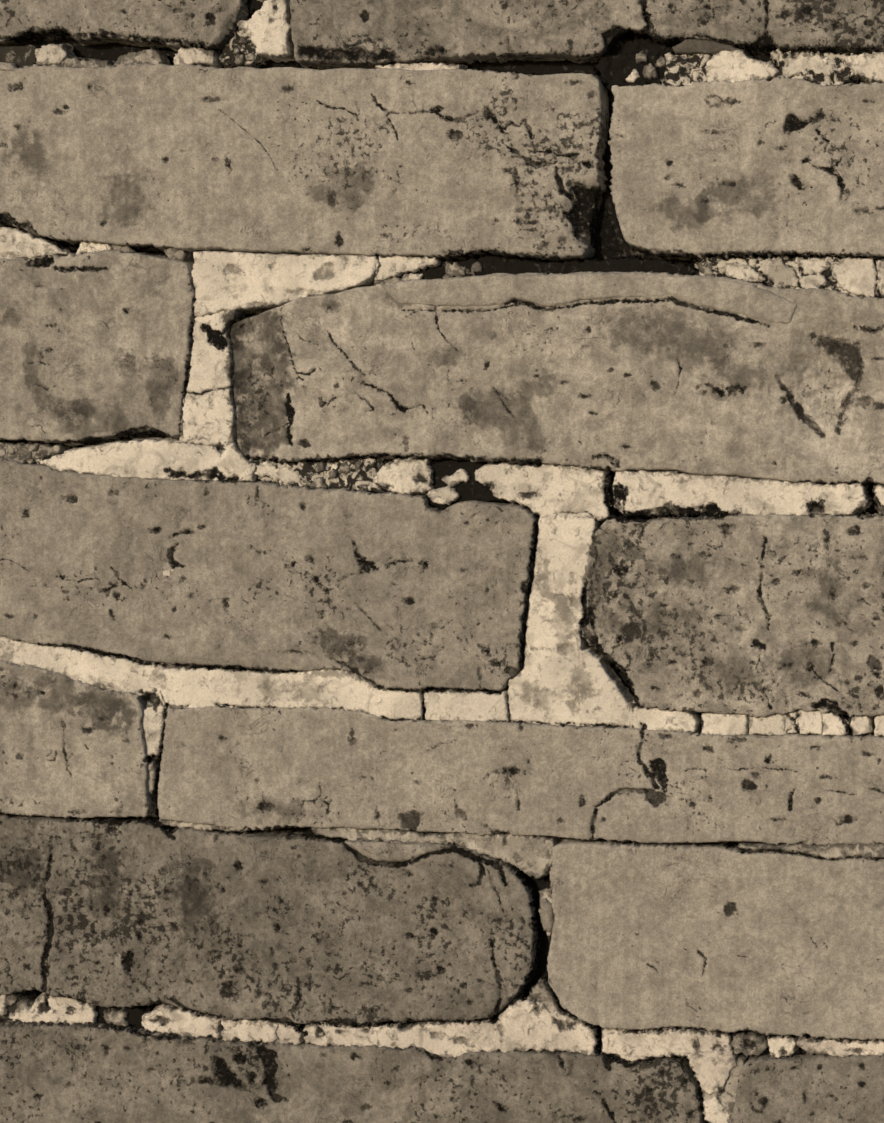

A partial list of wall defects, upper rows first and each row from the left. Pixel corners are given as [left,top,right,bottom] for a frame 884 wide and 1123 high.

crack [317,93,579,200]
crack [260,307,428,446]
crack [401,296,770,351]
crack [38,643,302,840]
crack [330,466,884,861]
crack [40,846,82,1006]
crack [206,782,604,1056]
crack [164,995,226,1019]